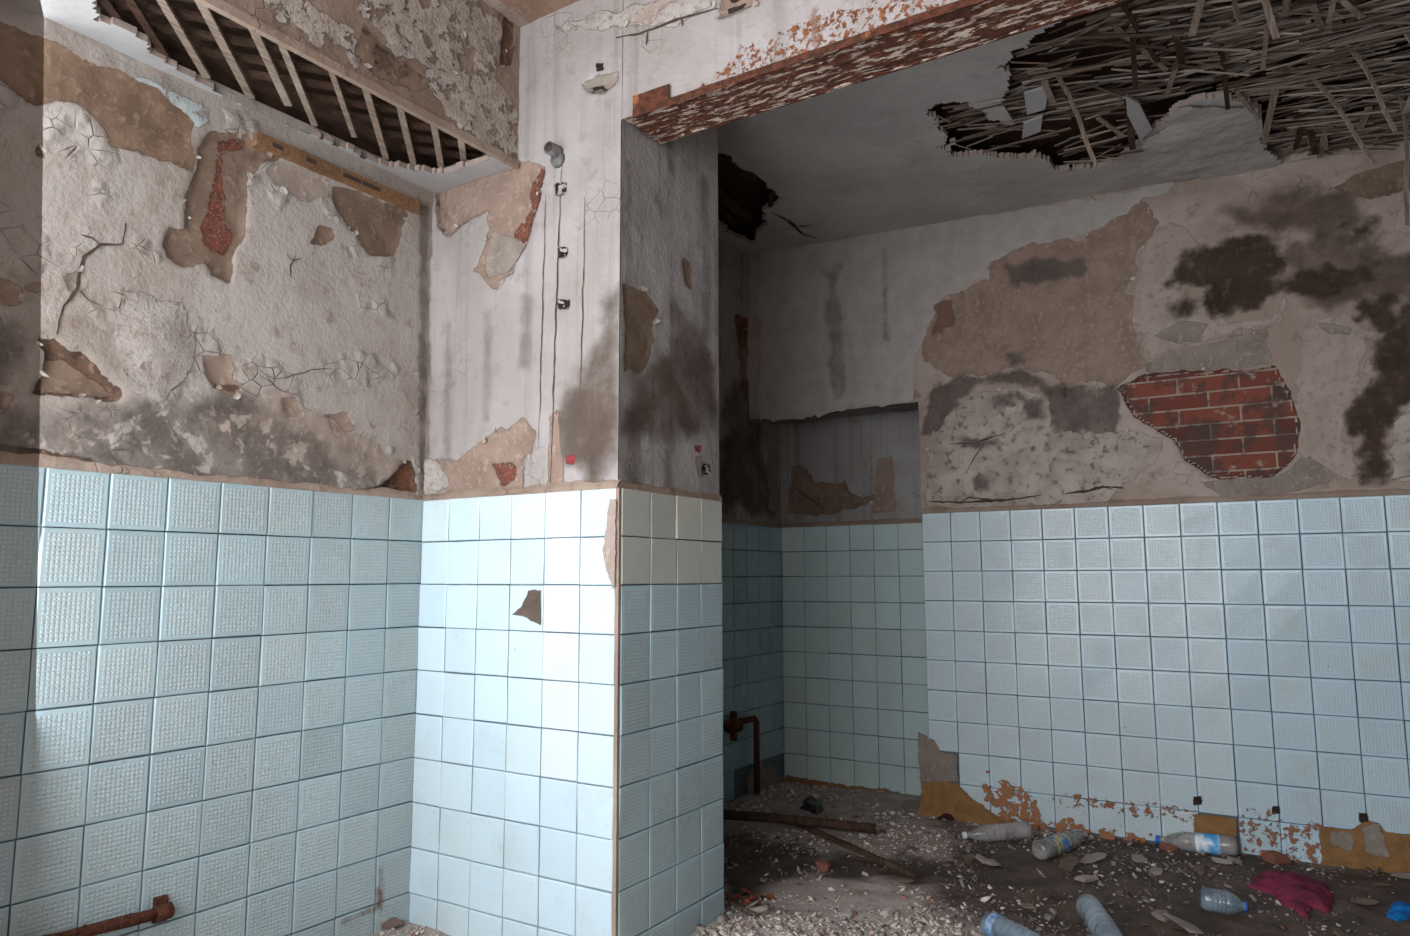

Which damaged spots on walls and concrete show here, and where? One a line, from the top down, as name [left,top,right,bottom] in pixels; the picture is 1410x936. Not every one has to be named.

crack [616,8,719,45]
rust [699,0,946,88]
peeling [0,21,408,284]
flaking render [97,0,759,290]
crack [56,223,126,335]
peeling [921,200,1272,388]
water stain [1165,191,1410,484]
water stain [558,311,774,516]
peeling [786,456,895,516]
spalling [512,590,541,625]
peeling [918,732,1238,843]
rust [1235,808,1334,864]